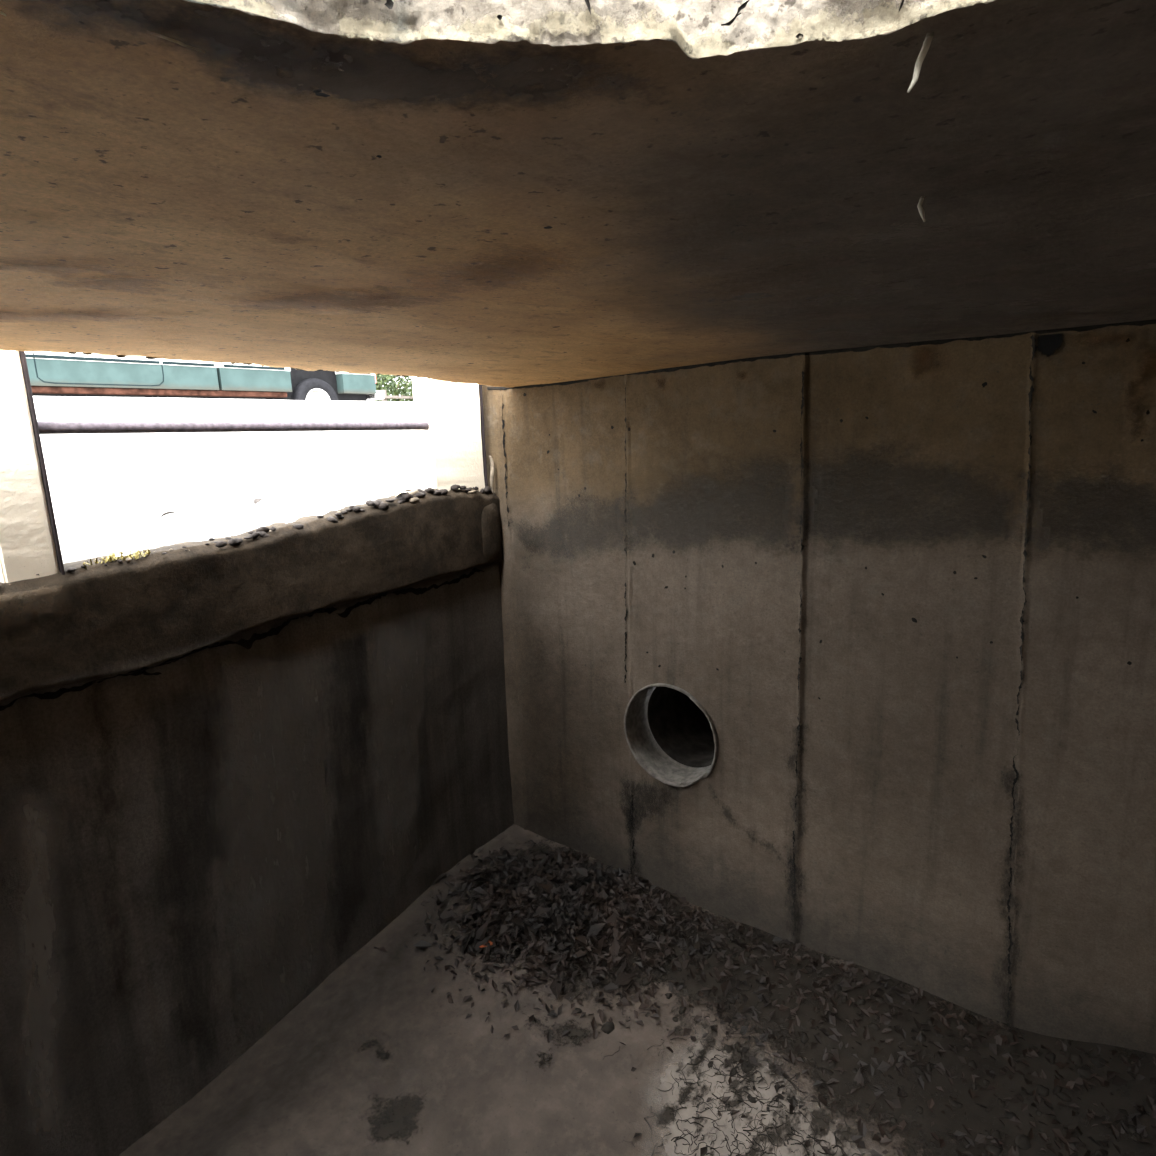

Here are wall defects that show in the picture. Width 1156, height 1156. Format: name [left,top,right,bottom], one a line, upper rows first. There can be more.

damp [519,447,1010,560]